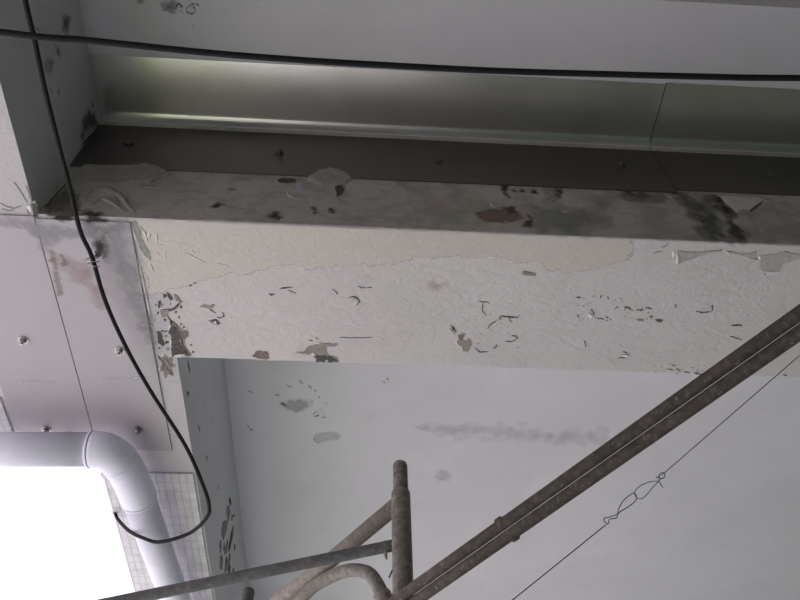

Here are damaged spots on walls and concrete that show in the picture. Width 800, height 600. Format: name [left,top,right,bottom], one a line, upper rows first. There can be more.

rust [477,185,533,227]
damp [623,191,745,242]
spalling [130,221,151,261]
peeling [672,250,800,275]
peeling [198,303,225,325]
peeling [576,295,663,322]
peeling [155,292,194,378]
spalling [252,350,269,360]
spalling [295,338,339,363]
spalling [449,325,497,353]
spalling [219,497,236,573]